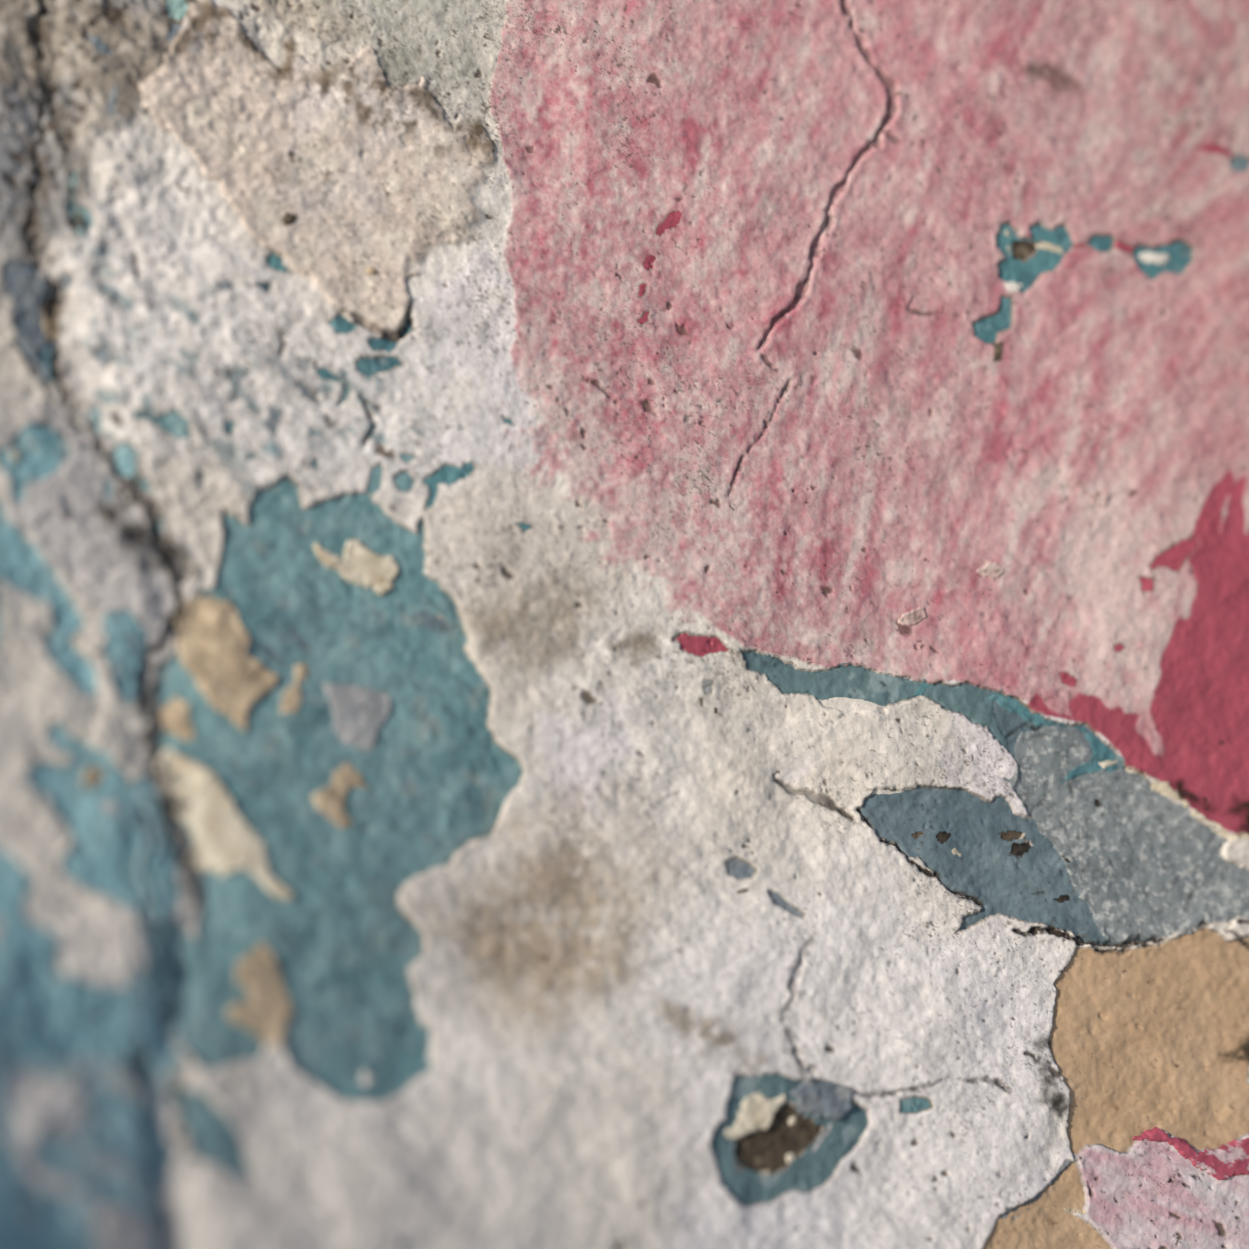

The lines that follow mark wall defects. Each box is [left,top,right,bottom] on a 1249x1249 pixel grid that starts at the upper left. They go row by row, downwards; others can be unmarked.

spalling [973,223,1192,362]
spalling [93,346,113,367]
crack [22,7,203,899]
spalling [134,410,191,439]
spalling [224,421,235,436]
spalling [270,408,283,437]
spalling [1139,538,1199,593]
peeling [0,424,523,1249]
peeling [673,632,1249,1249]